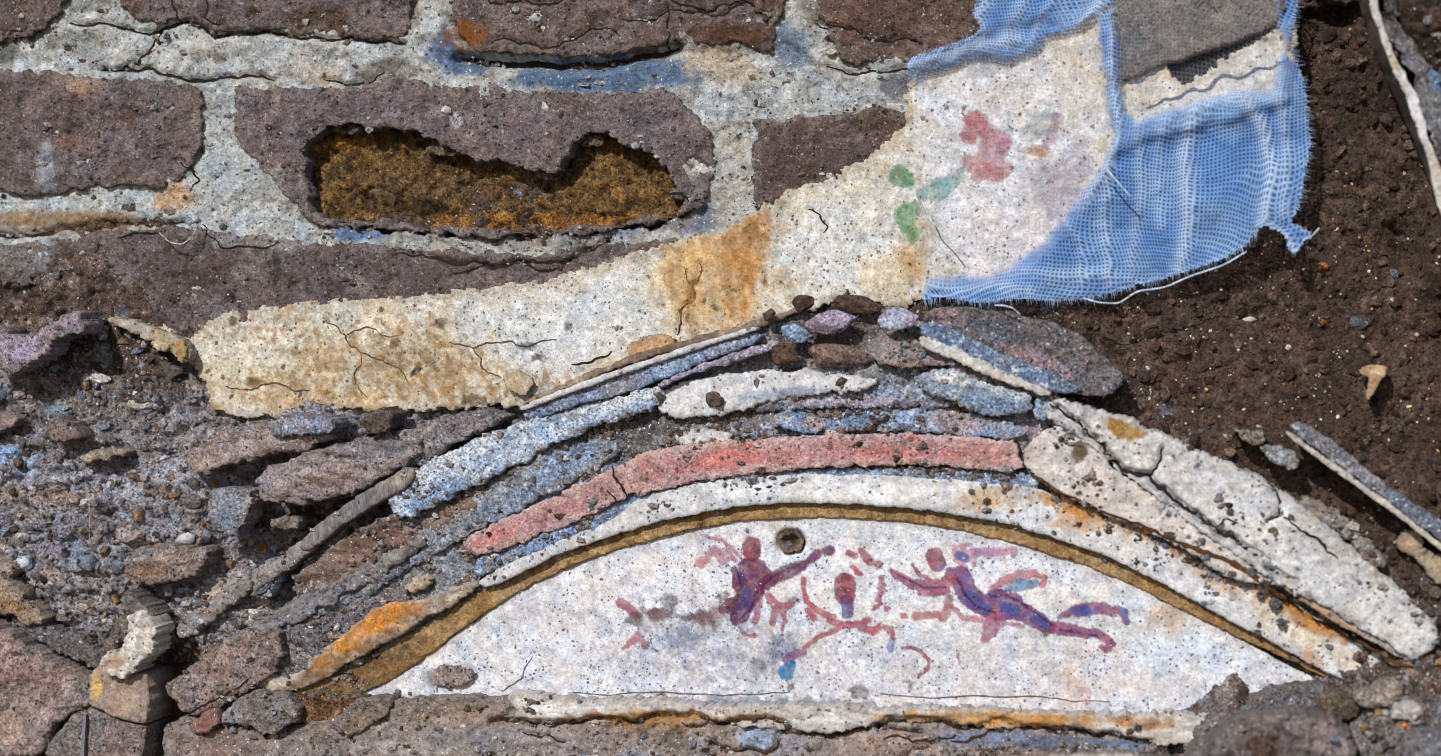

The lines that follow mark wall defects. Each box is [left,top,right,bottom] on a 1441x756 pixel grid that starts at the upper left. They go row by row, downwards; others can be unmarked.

spalling [309,124,685,236]
crack [226,382,309,392]
crack [322,317,408,397]
peeling [13,317,198,559]
peeling [0,482,53,585]
peeling [222,494,351,574]
crack [1032,403,1414,669]
peeling [53,560,112,616]
peeling [236,598,270,630]
peeling [190,705,227,734]